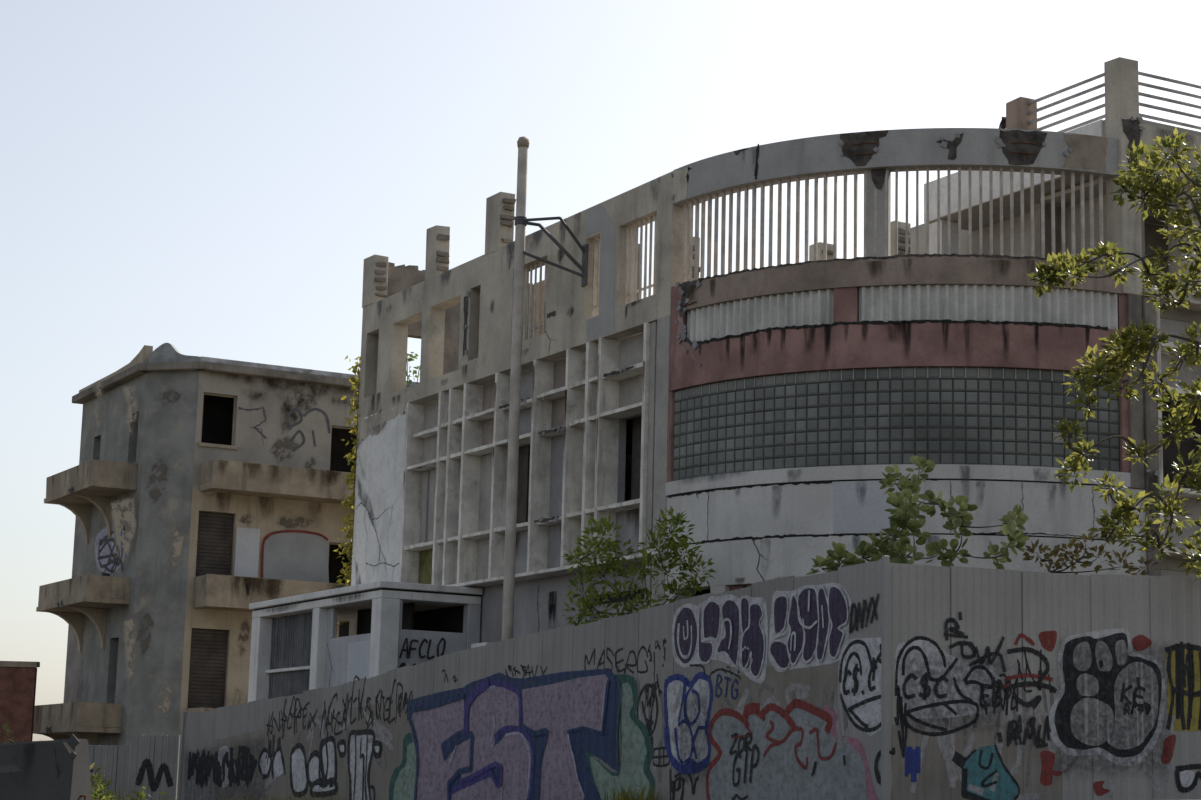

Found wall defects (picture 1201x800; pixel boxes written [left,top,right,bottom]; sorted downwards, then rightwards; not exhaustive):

spalling [839,130,889,189]
spalling [936,132,964,160]
spalling [995,130,1047,165]
peeling [1062,134,1108,172]
spalling [1122,116,1145,168]
spalling [675,278,703,350]
leakage [726,329,785,359]
leakage [810,324,831,350]
leakage [897,320,911,344]
crack [356,494,402,578]
crack [701,533,909,581]
crack [972,487,1126,538]